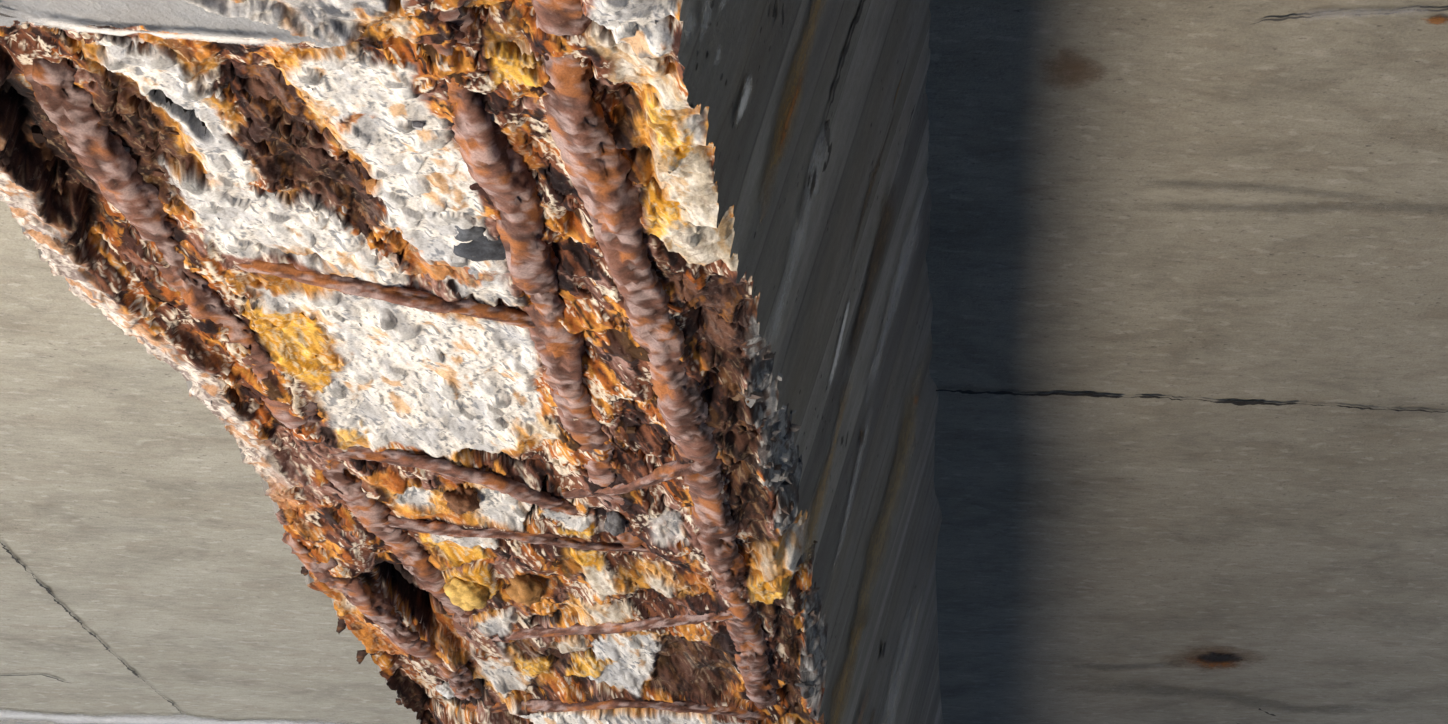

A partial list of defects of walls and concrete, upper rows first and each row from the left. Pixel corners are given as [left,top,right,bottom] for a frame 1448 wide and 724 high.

crack [821,0,865,168]
corrosion [852,124,893,350]
spalling [0,0,828,724]
crack [0,542,187,717]